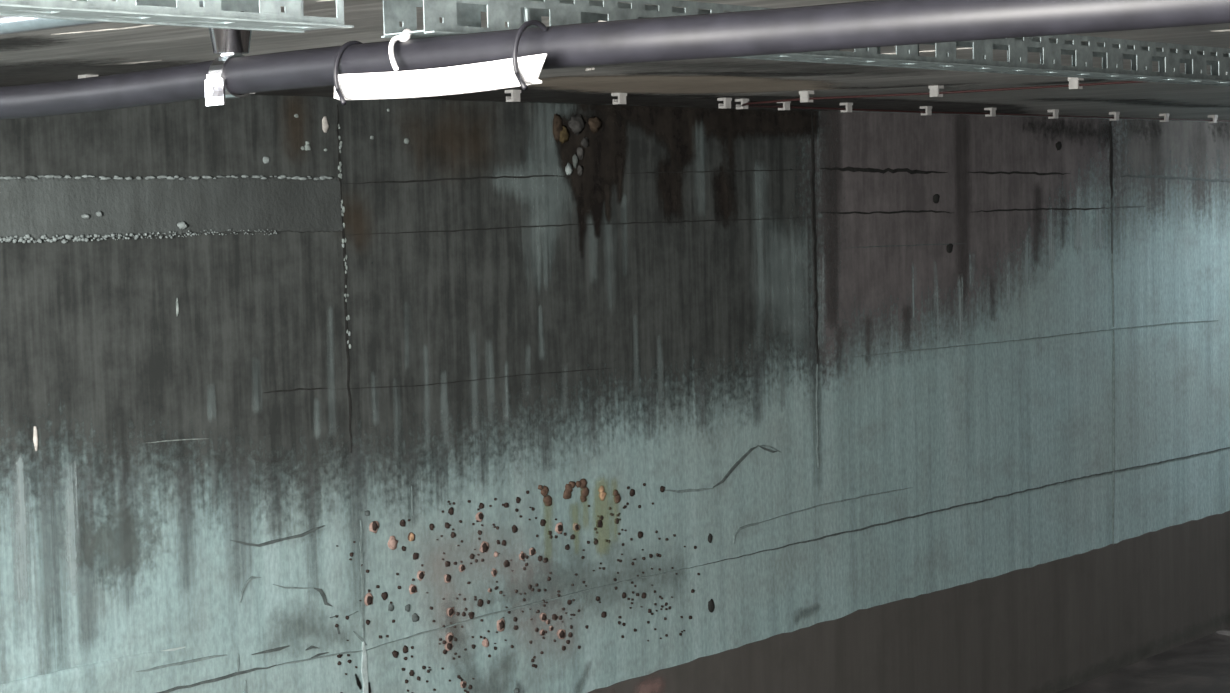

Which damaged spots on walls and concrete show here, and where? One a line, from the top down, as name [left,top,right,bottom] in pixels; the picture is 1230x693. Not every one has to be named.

damp [0,76,1230,600]
rust [336,479,697,693]
crack [137,445,1230,693]